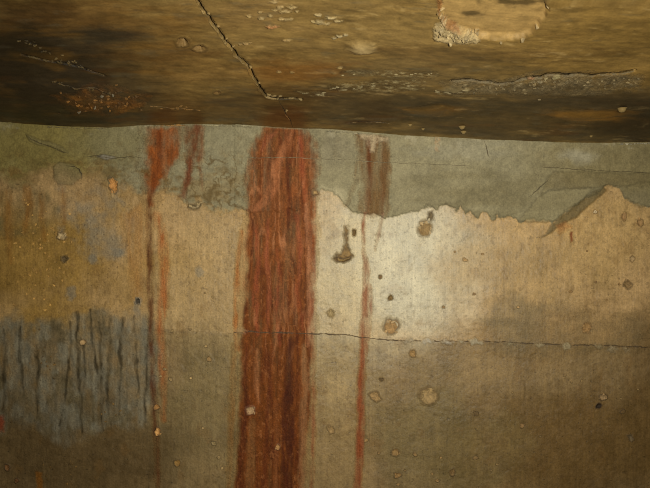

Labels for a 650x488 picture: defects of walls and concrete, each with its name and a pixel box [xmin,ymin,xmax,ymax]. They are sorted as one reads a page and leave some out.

leakage [0,27,127,128]
flaking render [0,122,140,198]
crack [195,0,302,127]
spalling [432,0,551,47]
flaking render [384,134,650,239]
leakage [555,87,650,142]
leakage [0,178,159,452]
corrosion [134,95,210,488]
corrosion [225,101,326,488]
spalling [331,224,357,264]
corrosion [343,132,393,488]
crack [228,327,650,353]